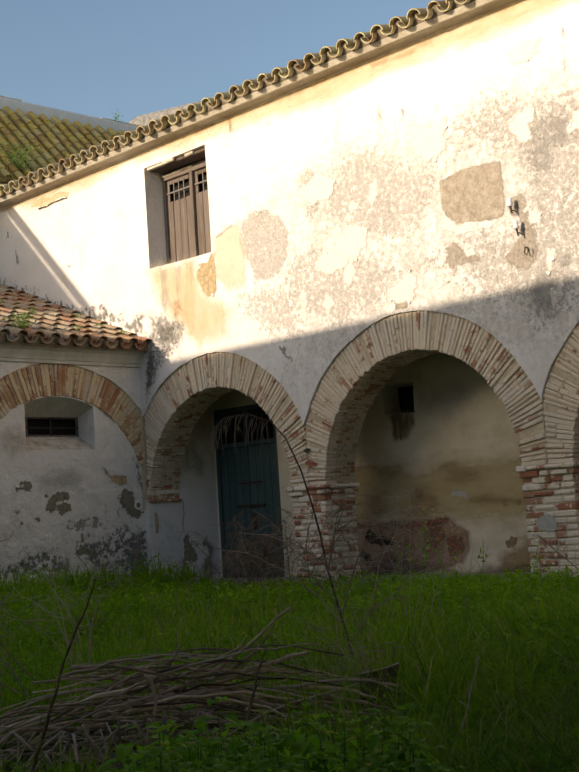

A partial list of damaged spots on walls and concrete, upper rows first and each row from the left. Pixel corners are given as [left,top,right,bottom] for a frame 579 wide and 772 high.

peeling [242,65,579,334]
flaking render [195,251,216,297]
damp [3,264,224,395]
flaking render [15,479,33,494]
flaking render [101,467,144,519]
flaking render [34,490,104,561]
peeling [357,518,469,575]